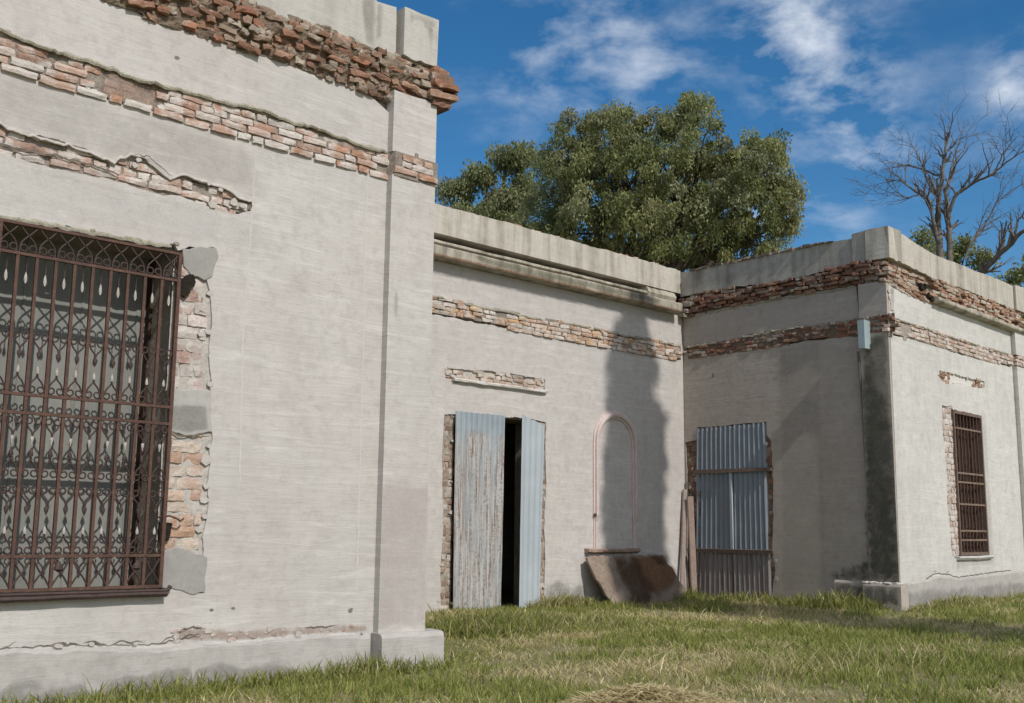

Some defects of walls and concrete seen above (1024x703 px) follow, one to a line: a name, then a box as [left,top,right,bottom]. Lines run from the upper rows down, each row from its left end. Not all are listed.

spalling [0,27,438,187]
flaking render [126,0,459,115]
spalling [0,122,252,214]
flaking render [175,264,212,390]
spalling [444,366,548,394]
spalling [432,259,1024,368]
spalling [938,371,984,388]
flaking render [157,433,204,550]
damp [836,373,1022,607]
flaking render [942,406,959,556]
crack [927,570,1011,579]
crack [0,630,244,649]